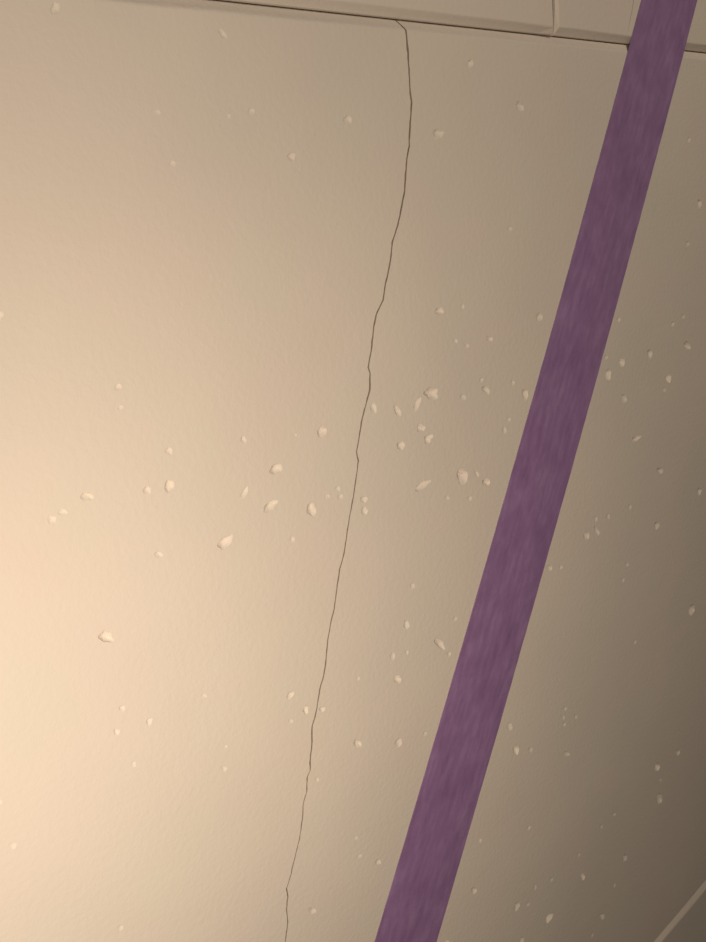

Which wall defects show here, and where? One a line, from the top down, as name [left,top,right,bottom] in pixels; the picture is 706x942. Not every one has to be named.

crack [285,20,412,942]